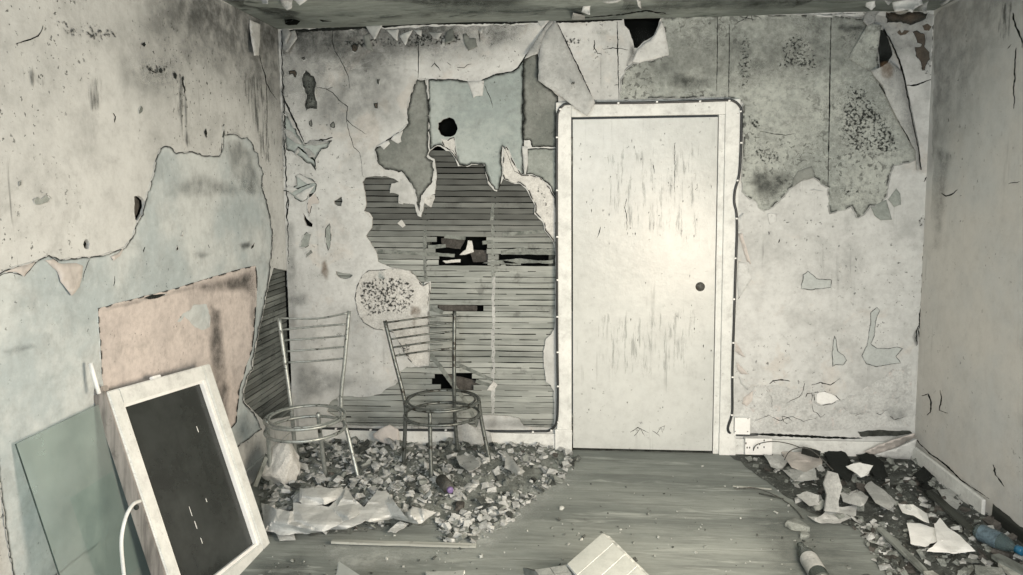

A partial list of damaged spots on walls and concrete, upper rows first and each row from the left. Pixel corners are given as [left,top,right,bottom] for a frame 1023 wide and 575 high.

peeling [571,6,590,20]
spalling [624,0,660,48]
peeling [863,0,950,71]
leakage [843,87,897,153]
peeling [792,166,822,192]
peeling [871,188,901,220]
flaking render [327,54,558,428]
leakage [360,278,414,314]
peeling [801,271,832,290]
peeling [0,126,292,575]
peeling [739,307,914,433]